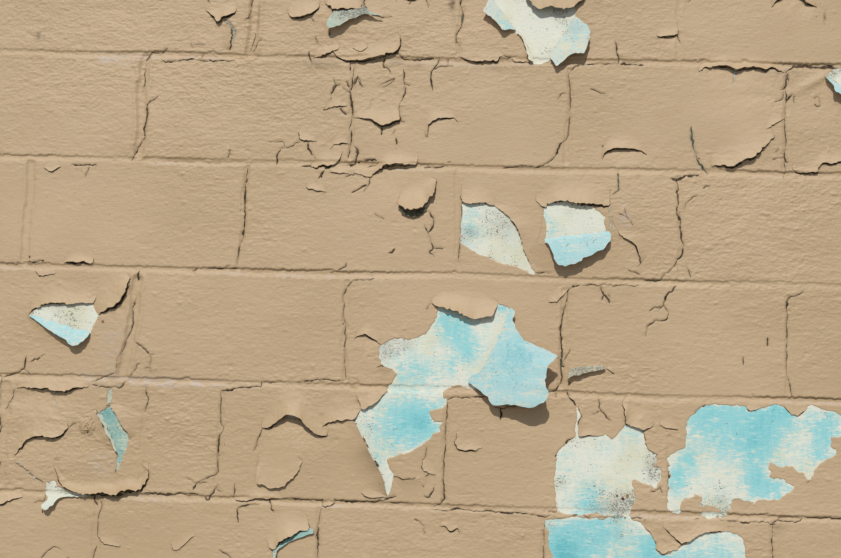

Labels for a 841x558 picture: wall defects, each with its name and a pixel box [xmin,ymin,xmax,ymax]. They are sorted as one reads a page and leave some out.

peeling [288,0,401,83]
peeling [459,0,590,66]
crack [0,354,45,388]
peeling [7,372,149,513]
peeling [27,251,131,362]
peeling [276,69,444,256]
crack [303,53,434,182]
peeling [233,290,557,558]
crack [292,396,589,558]
peeling [458,167,652,275]
crack [548,174,709,392]
peeling [544,362,841,558]